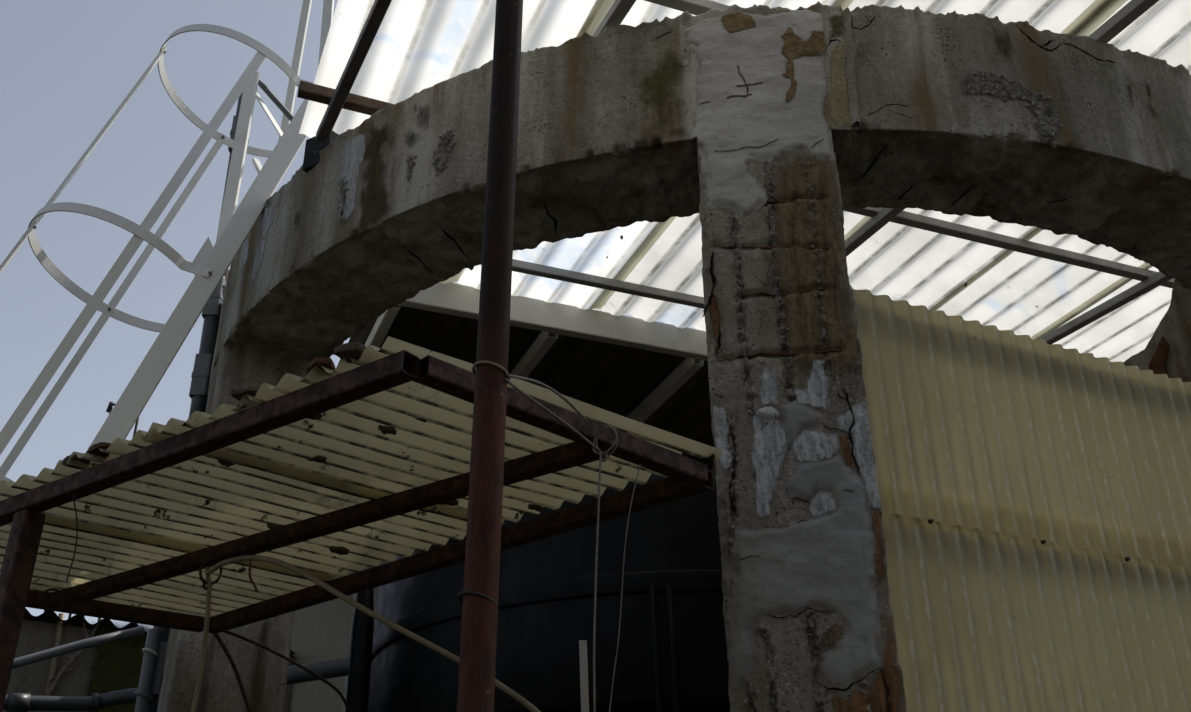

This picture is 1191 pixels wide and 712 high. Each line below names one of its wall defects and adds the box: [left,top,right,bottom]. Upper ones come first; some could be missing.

crack [1016,25,1118,64]
spalling [964,69,1063,148]
peeling [713,405,738,472]
peeling [747,360,881,517]
crack [825,390,860,492]
corrosion [832,617,902,712]